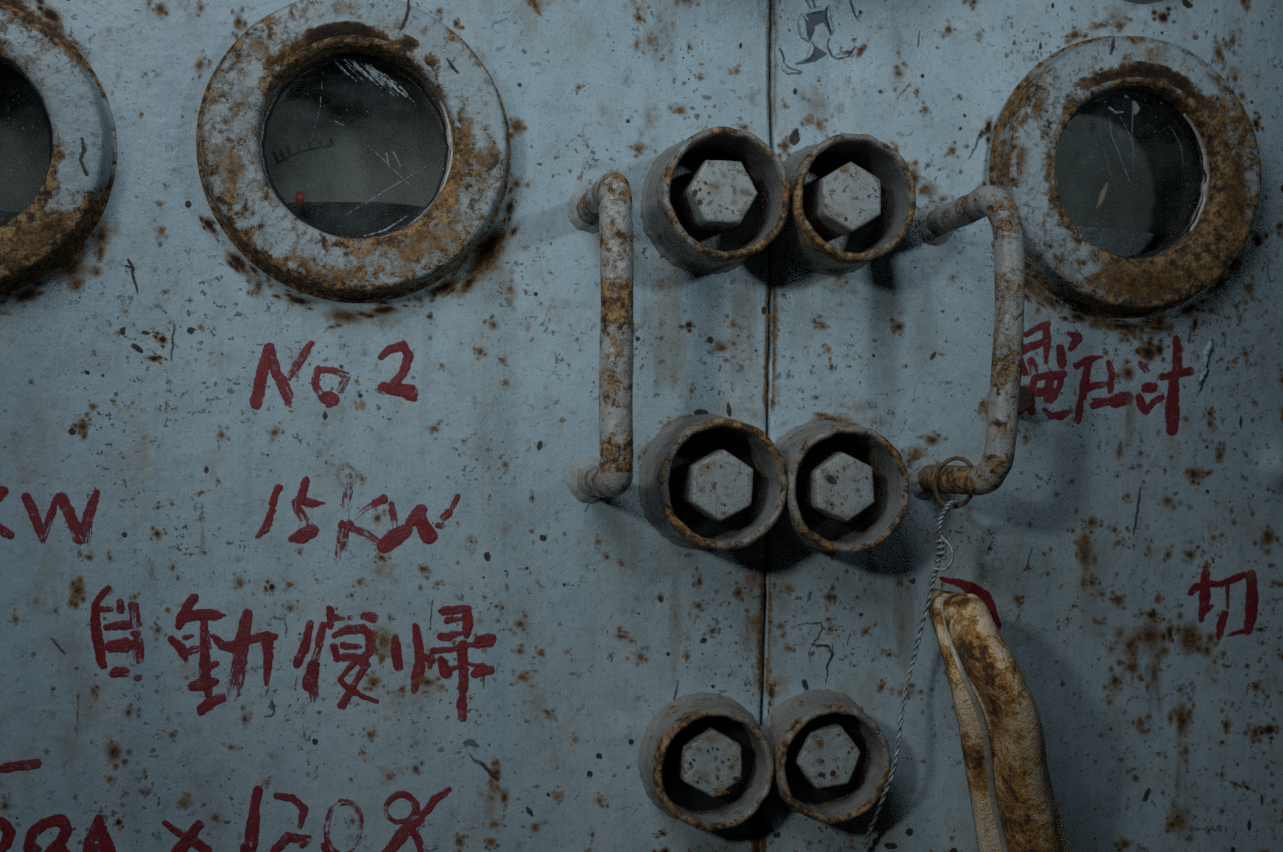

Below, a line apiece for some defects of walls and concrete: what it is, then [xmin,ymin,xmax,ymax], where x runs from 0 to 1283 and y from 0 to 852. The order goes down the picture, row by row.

corrosion [0,0,90,68]
corrosion [231,8,440,73]
peeling [779,0,856,94]
corrosion [1025,30,1283,380]
corrosion [1044,475,1283,829]